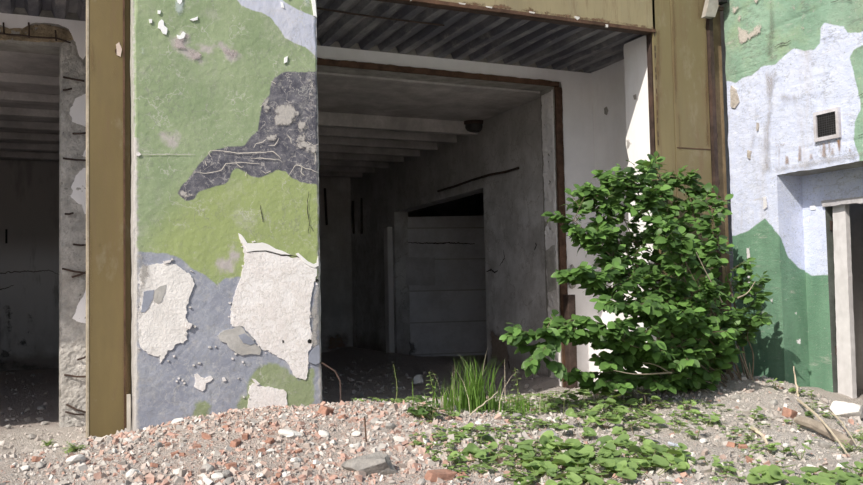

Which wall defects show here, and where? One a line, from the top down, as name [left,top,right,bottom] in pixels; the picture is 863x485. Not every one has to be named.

peeling [149,10,201,59]
spalling [733,7,761,44]
peeling [263,97,317,153]
spalling [0,22,86,427]
peeling [137,256,196,363]
peeling [208,233,342,401]
peeling [176,362,226,391]